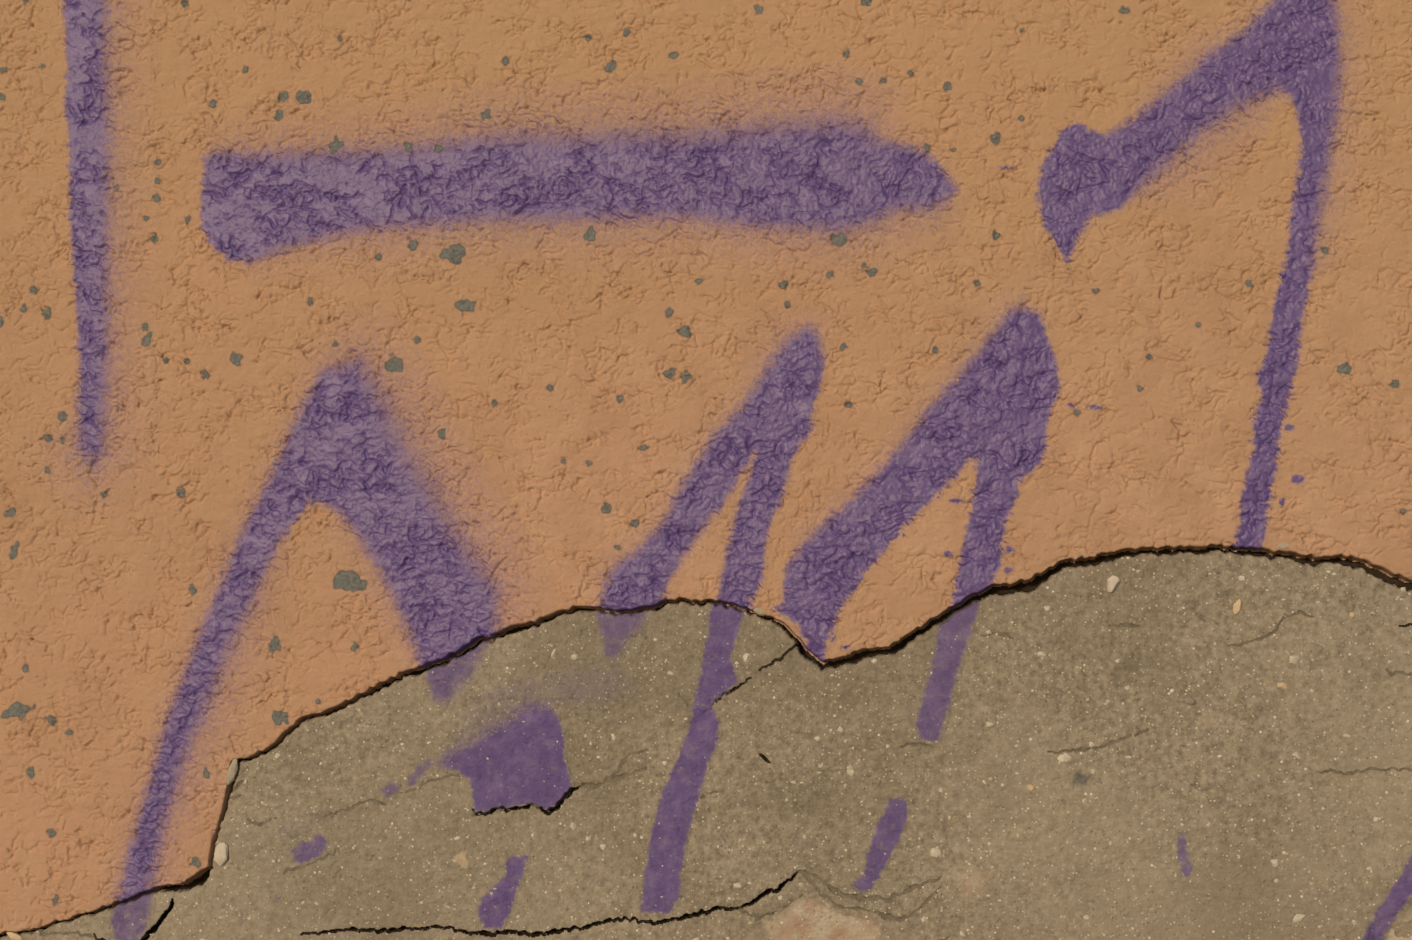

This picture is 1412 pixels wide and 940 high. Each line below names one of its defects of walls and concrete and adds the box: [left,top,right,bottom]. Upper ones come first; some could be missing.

crack [639,547,1412,708]
peeling [1,702,73,735]
crack [230,608,596,826]
spalling [140,550,1412,940]
crack [283,748,648,875]
spalling [0,907,114,940]
crack [141,869,211,940]
crack [300,870,942,938]